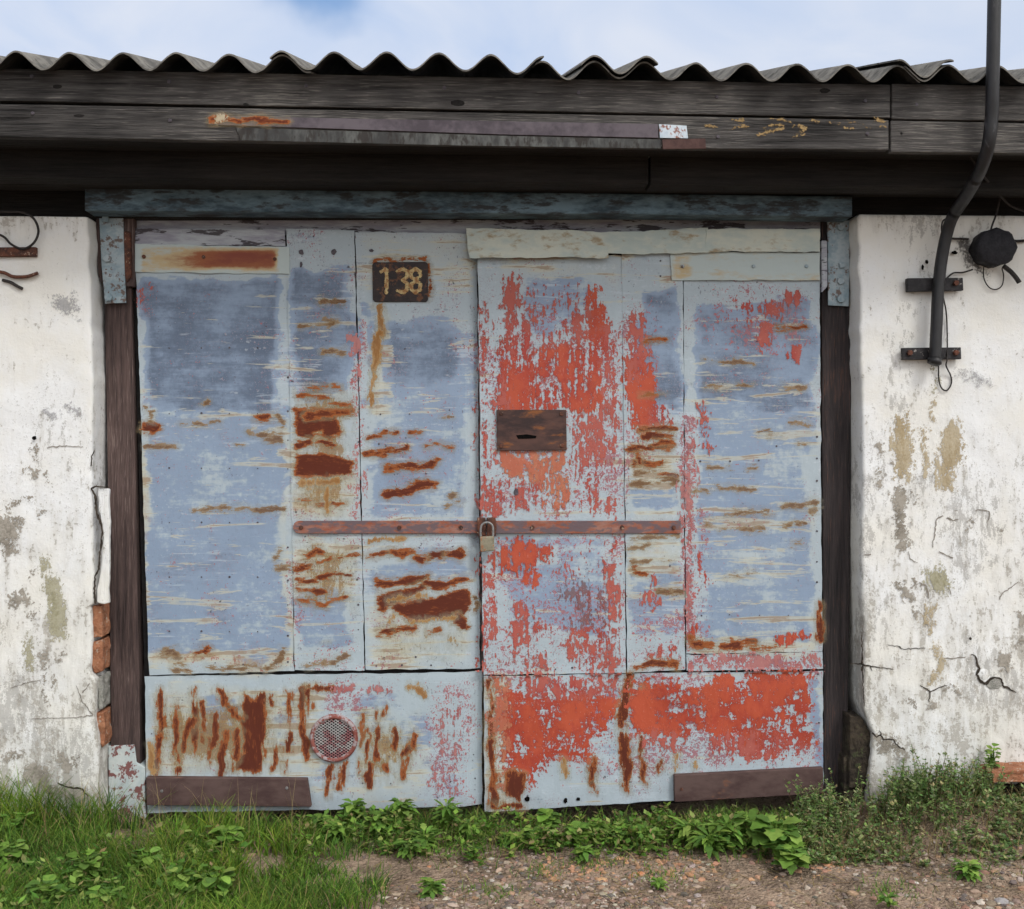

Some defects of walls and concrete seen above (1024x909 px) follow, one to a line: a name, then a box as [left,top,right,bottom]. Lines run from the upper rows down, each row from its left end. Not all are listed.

rust [235,383,461,514]
rust [273,535,481,650]
peeling [426,270,825,798]
rust [624,424,680,489]
flaking render [872,442,922,553]
flaking render [892,577,922,620]
crack [908,509,990,599]
crack [850,635,920,706]
crack [947,654,1015,692]
rust [147,683,334,776]
rust [324,705,419,797]
crack [872,730,905,750]